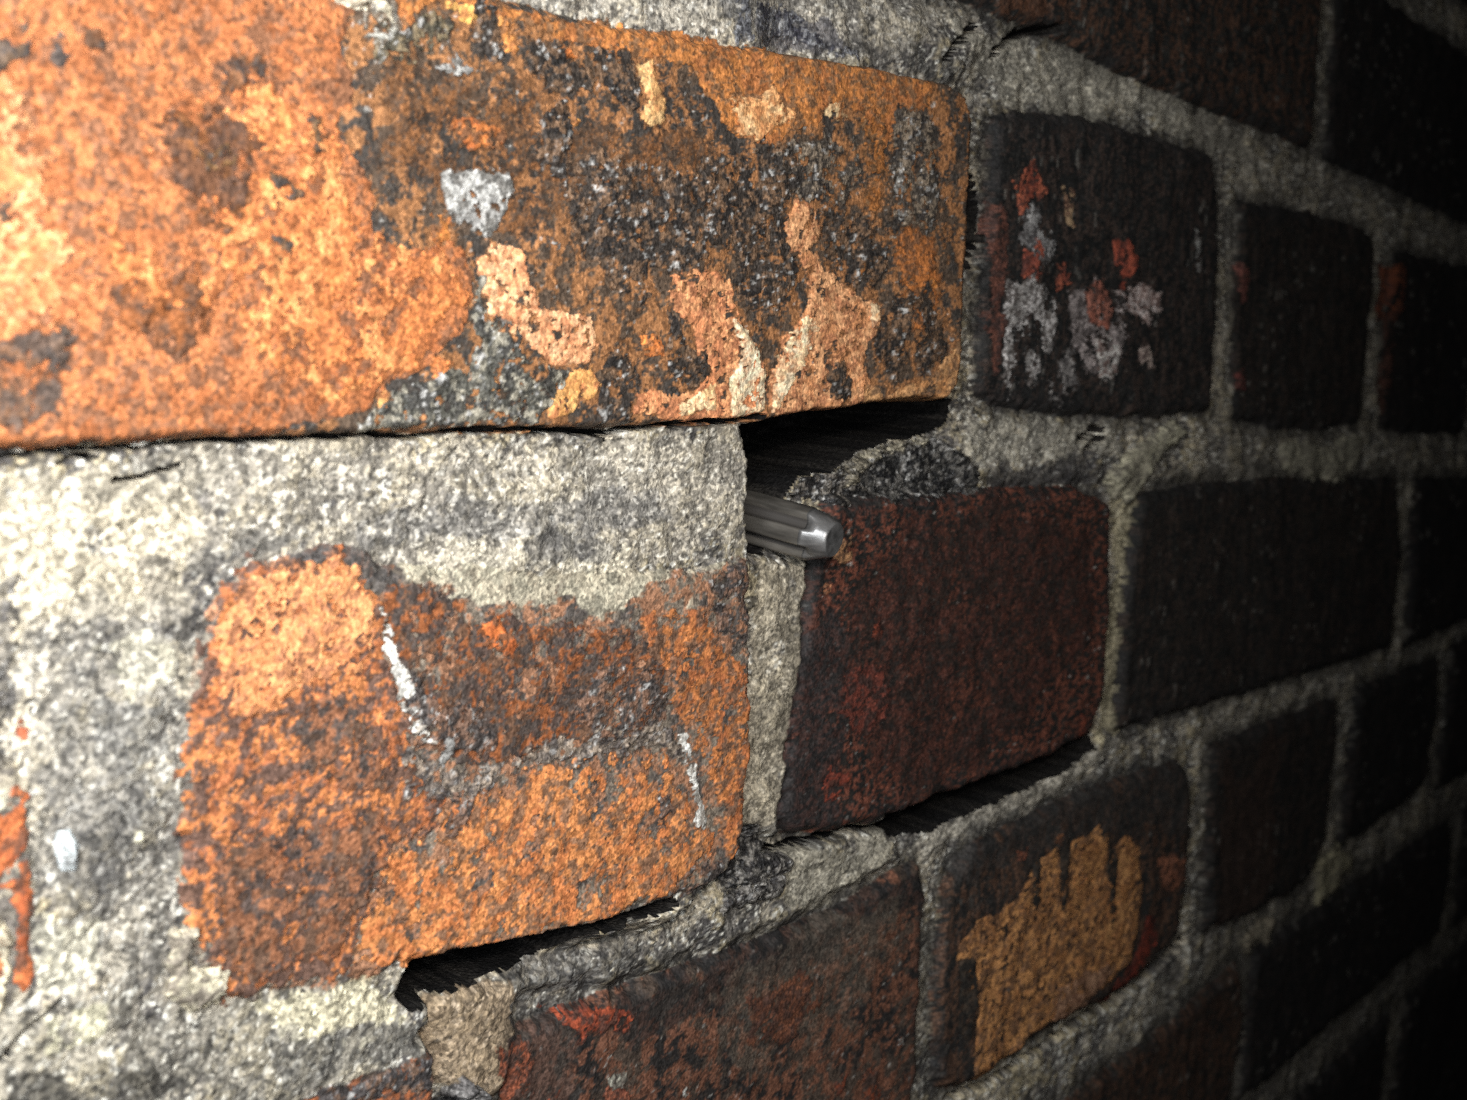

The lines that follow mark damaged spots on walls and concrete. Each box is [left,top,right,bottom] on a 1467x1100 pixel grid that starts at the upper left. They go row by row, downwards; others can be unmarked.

crack [0,413,767,483]
crack [762,824,872,851]